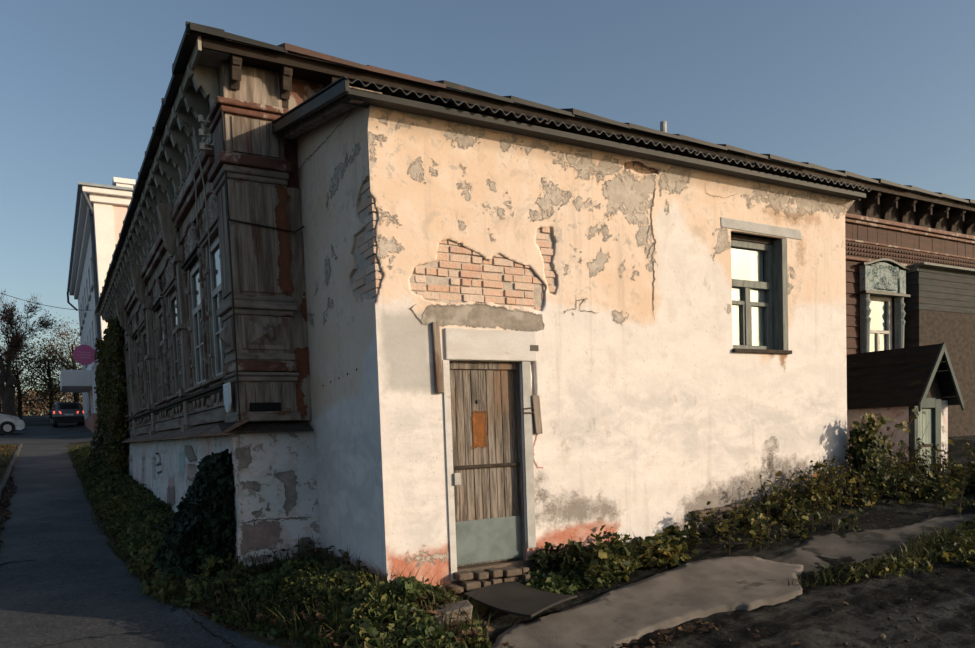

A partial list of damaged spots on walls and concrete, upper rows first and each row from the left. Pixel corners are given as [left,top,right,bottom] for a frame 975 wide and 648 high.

peeling [274,183,337,327]
flaking render [326,109,691,332]
crack [647,181,656,320]
peeling [235,447,262,492]
peeling [240,469,298,562]
peeling [405,545,450,567]
damp [535,494,616,523]
damp [675,446,848,537]